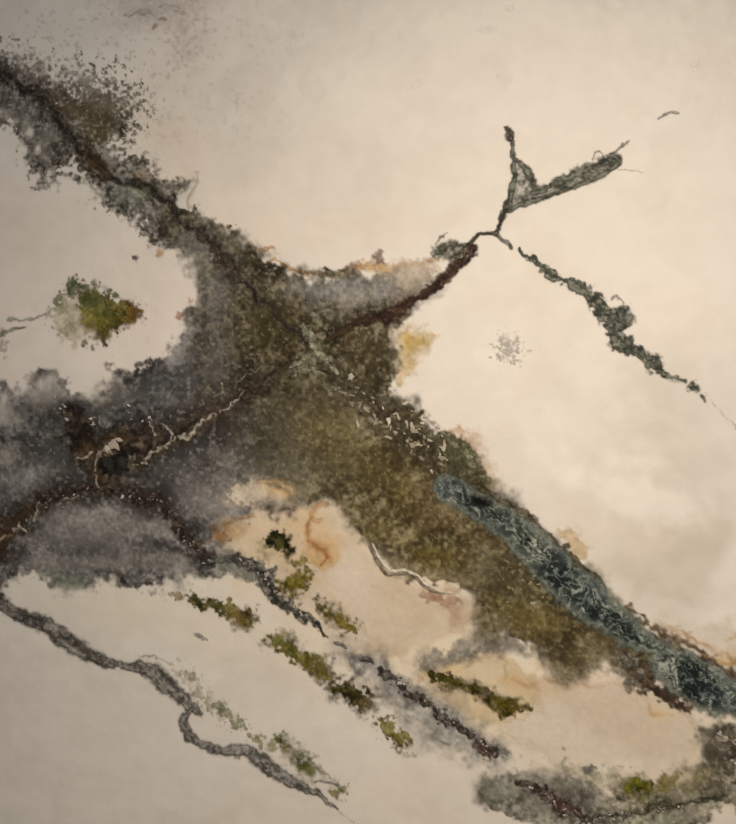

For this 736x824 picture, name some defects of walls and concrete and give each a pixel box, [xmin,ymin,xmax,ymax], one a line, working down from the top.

damp [0,50,657,765]
crack [0,70,706,587]
crack [0,583,339,810]
crack [0,481,499,759]
crack [493,559,543,606]
damp [421,651,736,824]
damp [432,431,736,718]
crack [514,779,726,824]